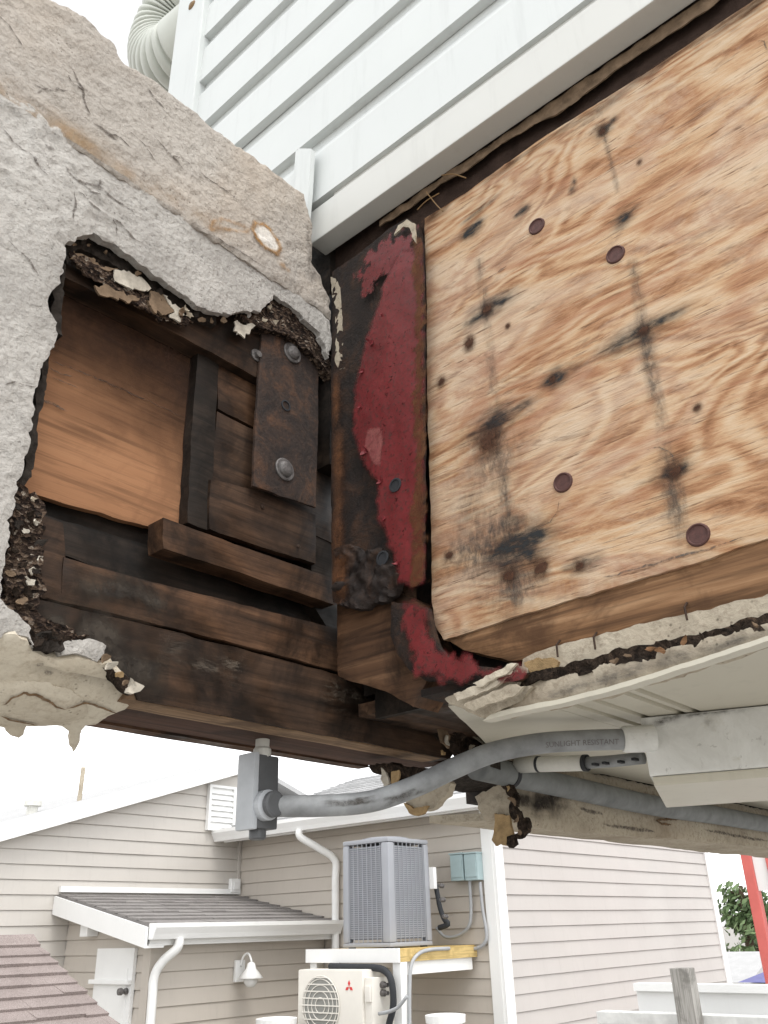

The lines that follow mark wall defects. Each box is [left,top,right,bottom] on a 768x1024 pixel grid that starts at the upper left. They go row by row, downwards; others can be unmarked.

crack [37,71,234,197]
crack [67,168,135,239]
corrosion [252,221,285,266]
spalling [48,238,332,383]
damp [607,309,681,355]
peeling [353,225,427,587]
damp [469,401,529,469]
spalling [0,355,145,696]
damp [445,479,548,600]
peeling [401,604,526,684]
crack [2,692,115,725]